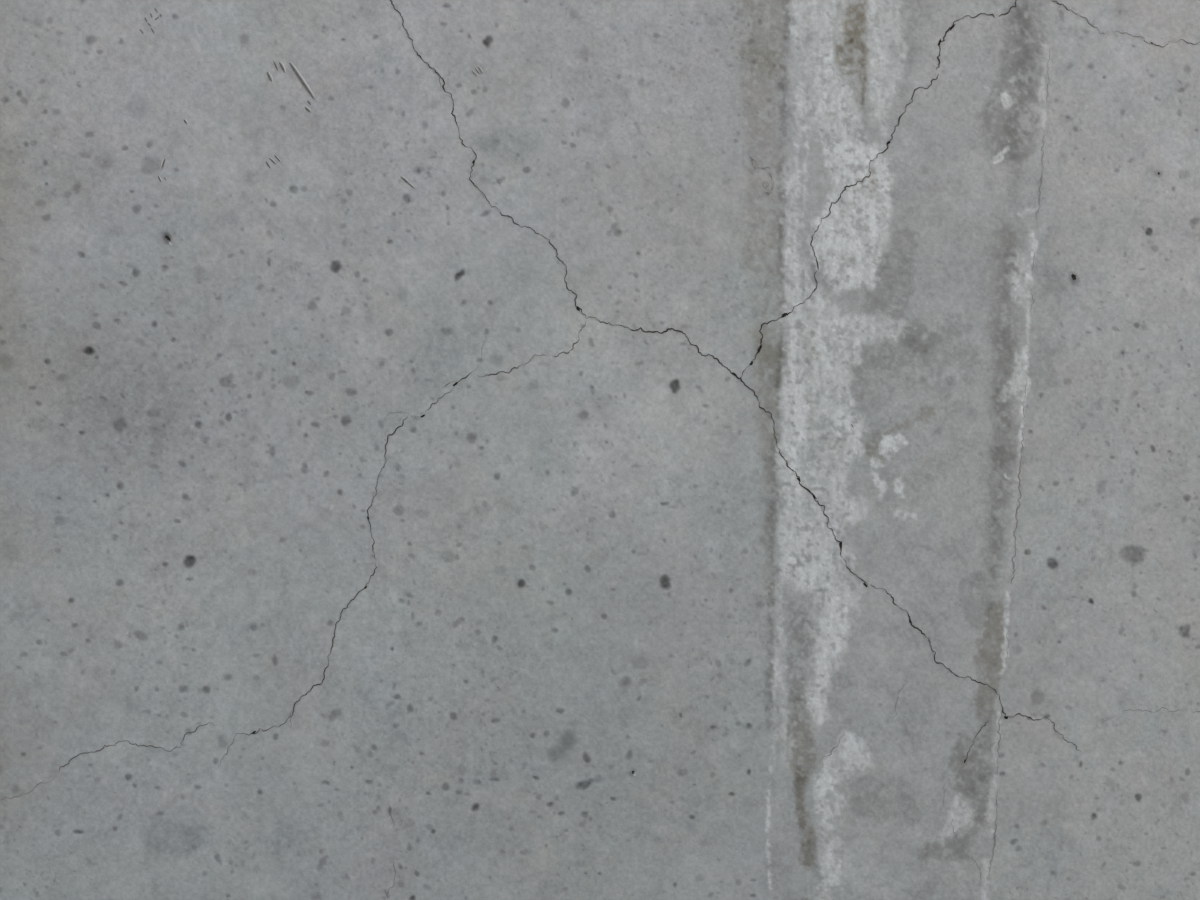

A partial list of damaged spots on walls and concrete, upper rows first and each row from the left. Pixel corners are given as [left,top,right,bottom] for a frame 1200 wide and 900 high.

crack [2,0,1079,800]
water stain [729,0,1078,900]
crack [1052,1,1199,48]